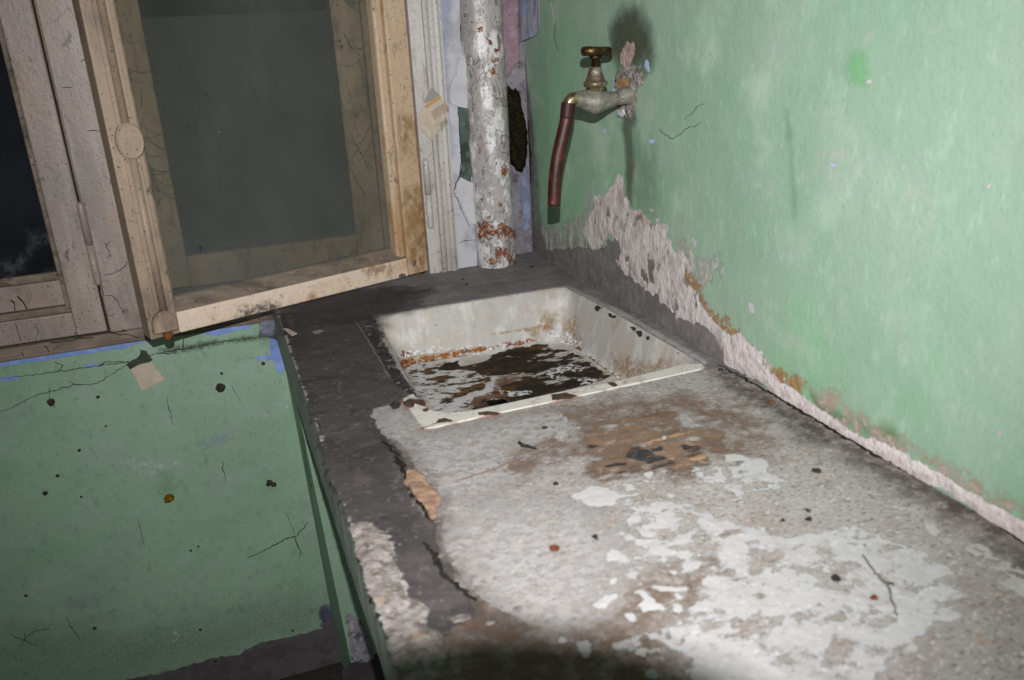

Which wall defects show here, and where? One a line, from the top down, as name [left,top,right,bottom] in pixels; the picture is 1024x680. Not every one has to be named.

spalling [613,60,650,120]
corrosion [477,203,517,267]
crack [0,336,266,412]
peeling [539,174,1024,542]
damp [634,396,758,454]
spalling [404,468,442,520]
crack [248,510,308,558]
damp [377,404,672,680]
spalling [344,517,450,680]
peeling [571,471,1024,680]
crack [862,554,898,616]
peeling [557,637,593,659]